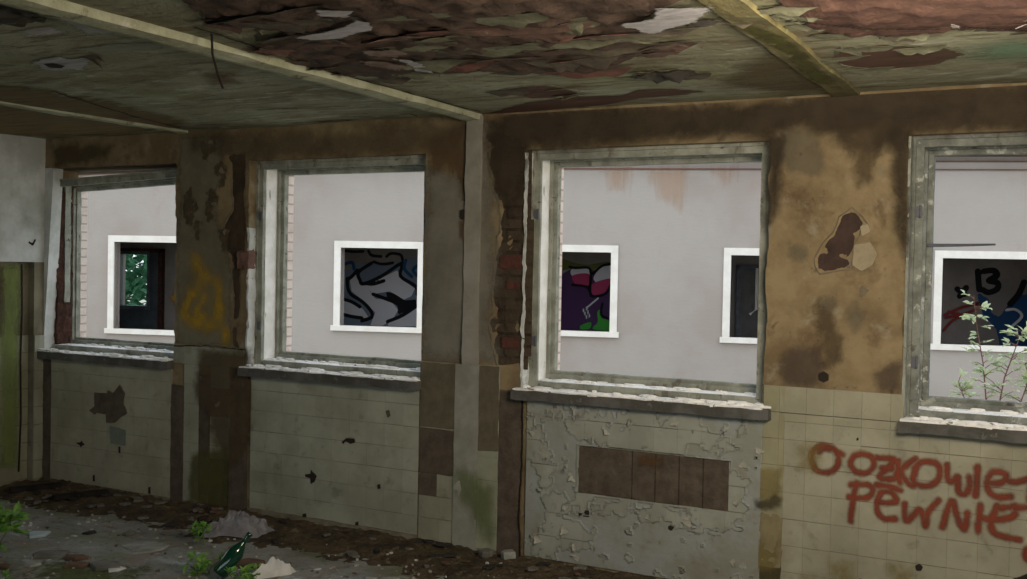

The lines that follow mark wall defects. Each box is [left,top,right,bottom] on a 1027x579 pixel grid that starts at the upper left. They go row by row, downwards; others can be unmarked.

peeling [34,56,104,72]
peeling [182,0,712,113]
peeling [757,0,1027,76]
flaking render [183,154,255,348]
flaking render [813,207,877,275]
peeling [478,134,782,579]
water stain [783,307,841,385]
water stain [878,365,901,390]
spalling [89,385,127,453]